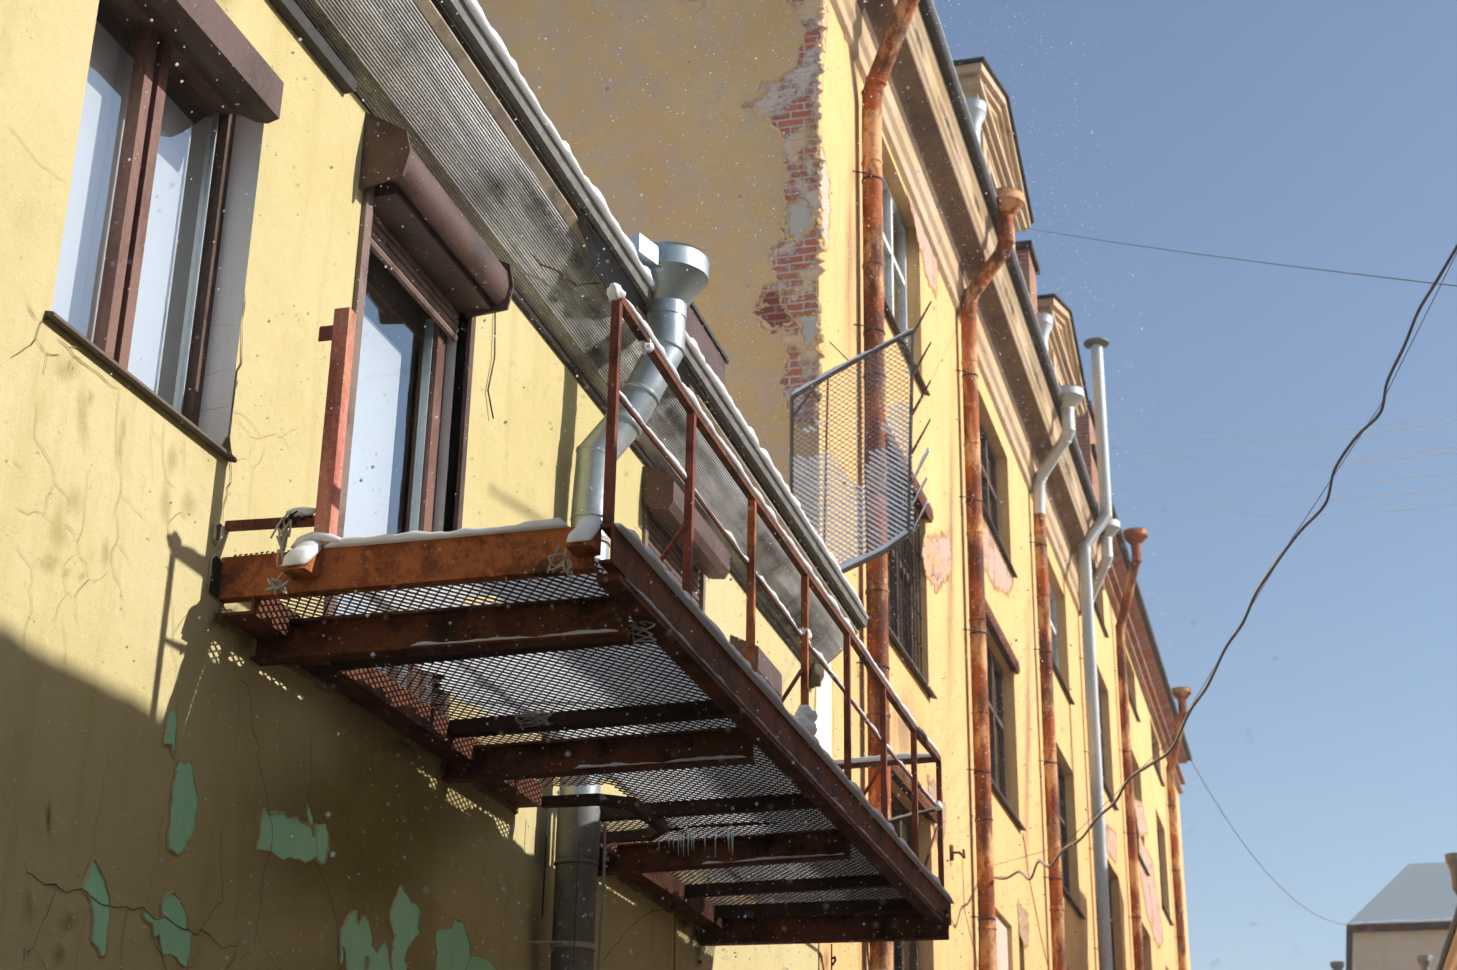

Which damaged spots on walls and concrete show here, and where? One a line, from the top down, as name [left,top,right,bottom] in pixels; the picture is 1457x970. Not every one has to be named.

flaking render [740,0,831,428]
crack [12,300,281,970]
peeling [163,708,199,857]
peeling [255,802,330,866]
peeling [80,858,111,959]
peeling [142,890,193,970]
peeling [339,885,497,970]